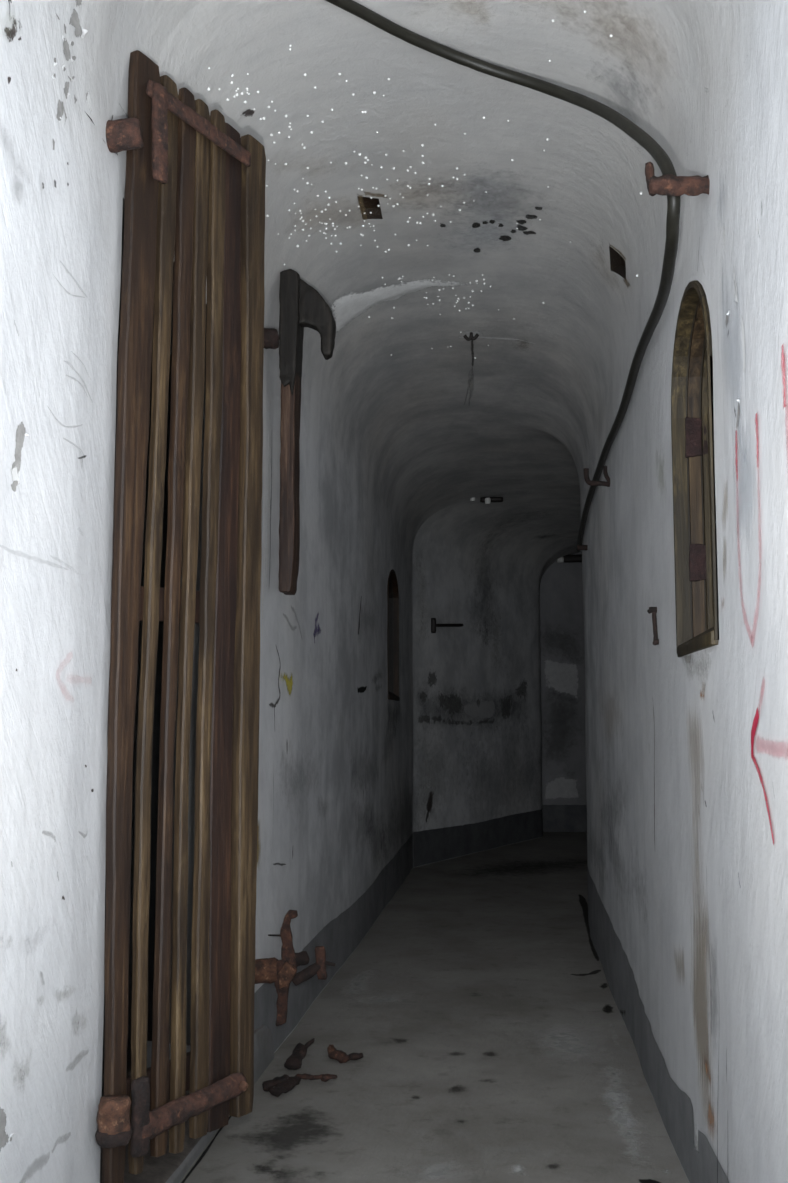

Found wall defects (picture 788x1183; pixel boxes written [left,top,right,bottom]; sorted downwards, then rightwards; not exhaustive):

peeling [52,0,92,121]
leakage [472,207,542,241]
flaking render [11,422,29,491]